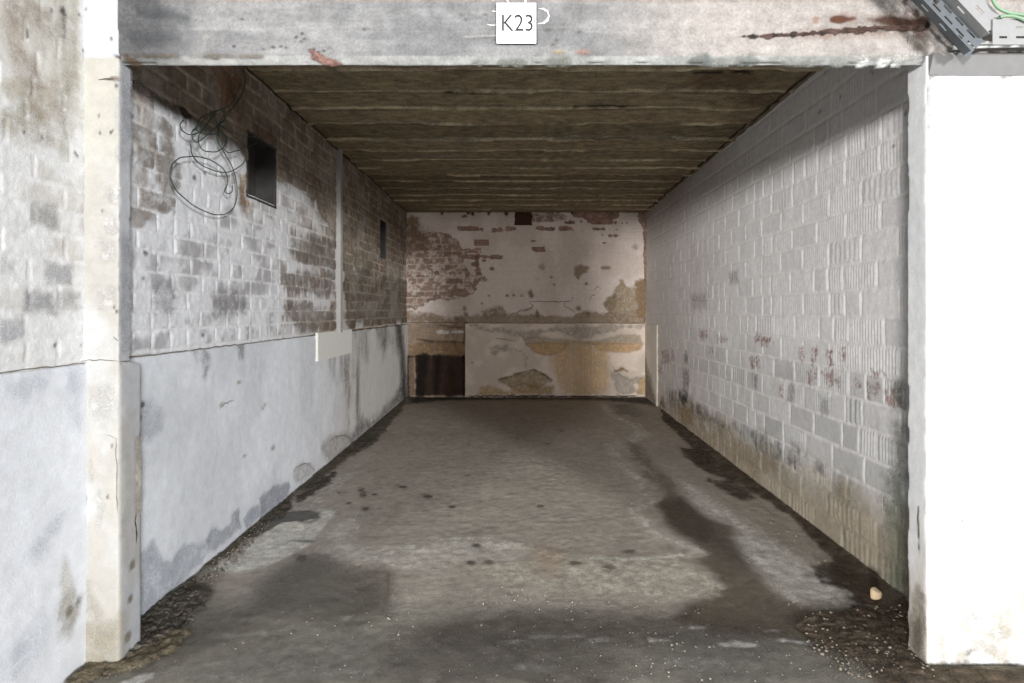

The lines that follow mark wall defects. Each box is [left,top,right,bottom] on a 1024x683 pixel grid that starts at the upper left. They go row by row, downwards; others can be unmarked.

corrosion [876,16,929,27]
peeling [98,217,147,352]
peeling [110,45,647,397]
crack [109,434,140,543]
water stain [209,311,906,680]